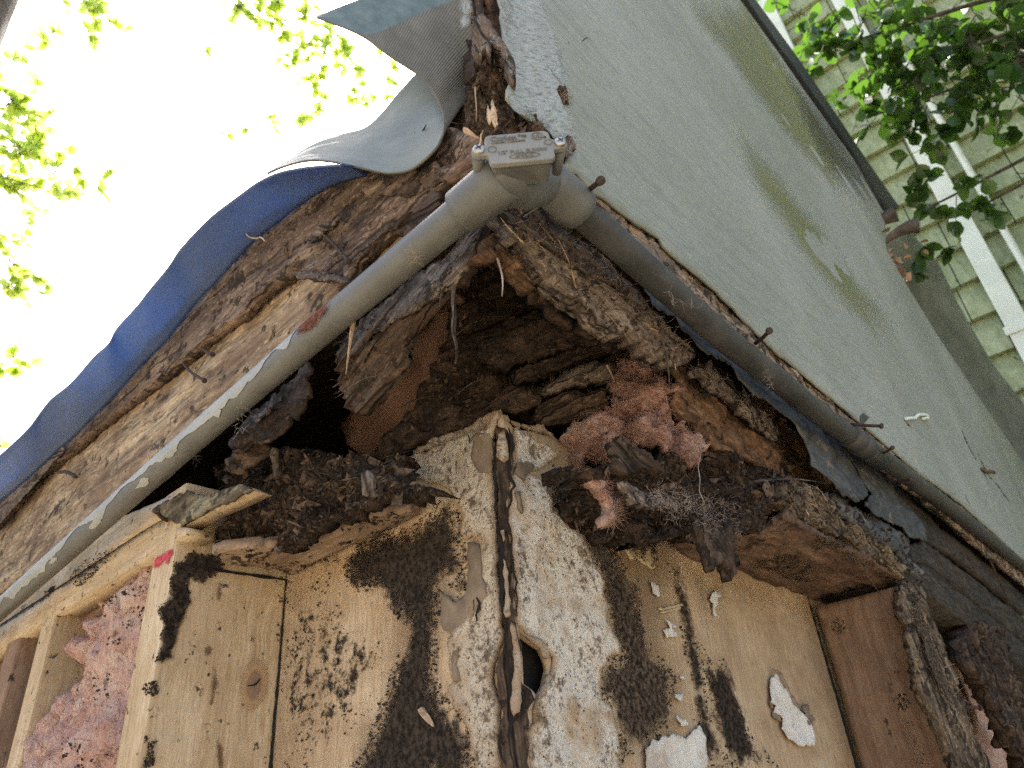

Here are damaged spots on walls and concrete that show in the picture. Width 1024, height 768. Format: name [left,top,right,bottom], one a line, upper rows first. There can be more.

leakage [154,550,225,664]
peeling [213,446,415,557]
leakage [278,462,496,768]
crack [455,426,535,768]
leakage [518,478,779,768]
peeling [566,447,800,597]
peeling [645,715,709,768]